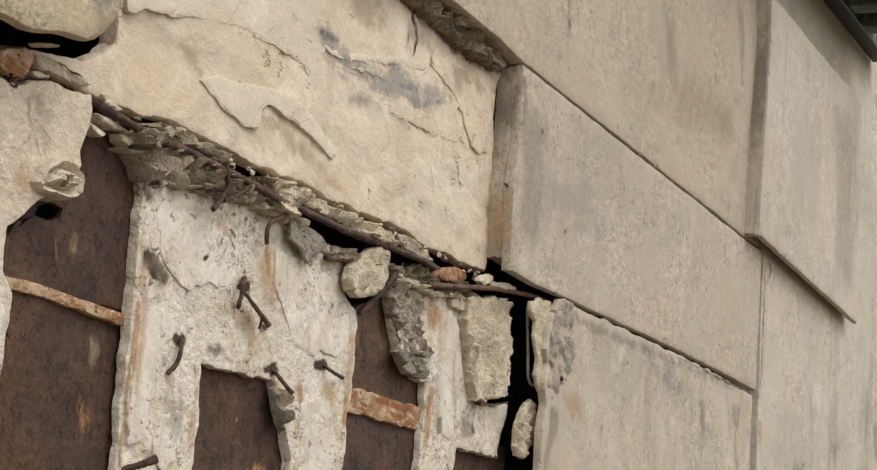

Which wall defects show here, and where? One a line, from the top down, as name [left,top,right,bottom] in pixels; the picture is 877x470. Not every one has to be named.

spalling [0,43,91,93]
crack [170,2,310,70]
crack [217,96,310,128]
corrosion [92,97,441,270]
peeling [123,0,511,159]
water stain [320,28,444,108]
crack [311,6,487,212]
spalling [86,93,480,440]
peeling [124,307,188,470]
peeling [298,399,335,470]